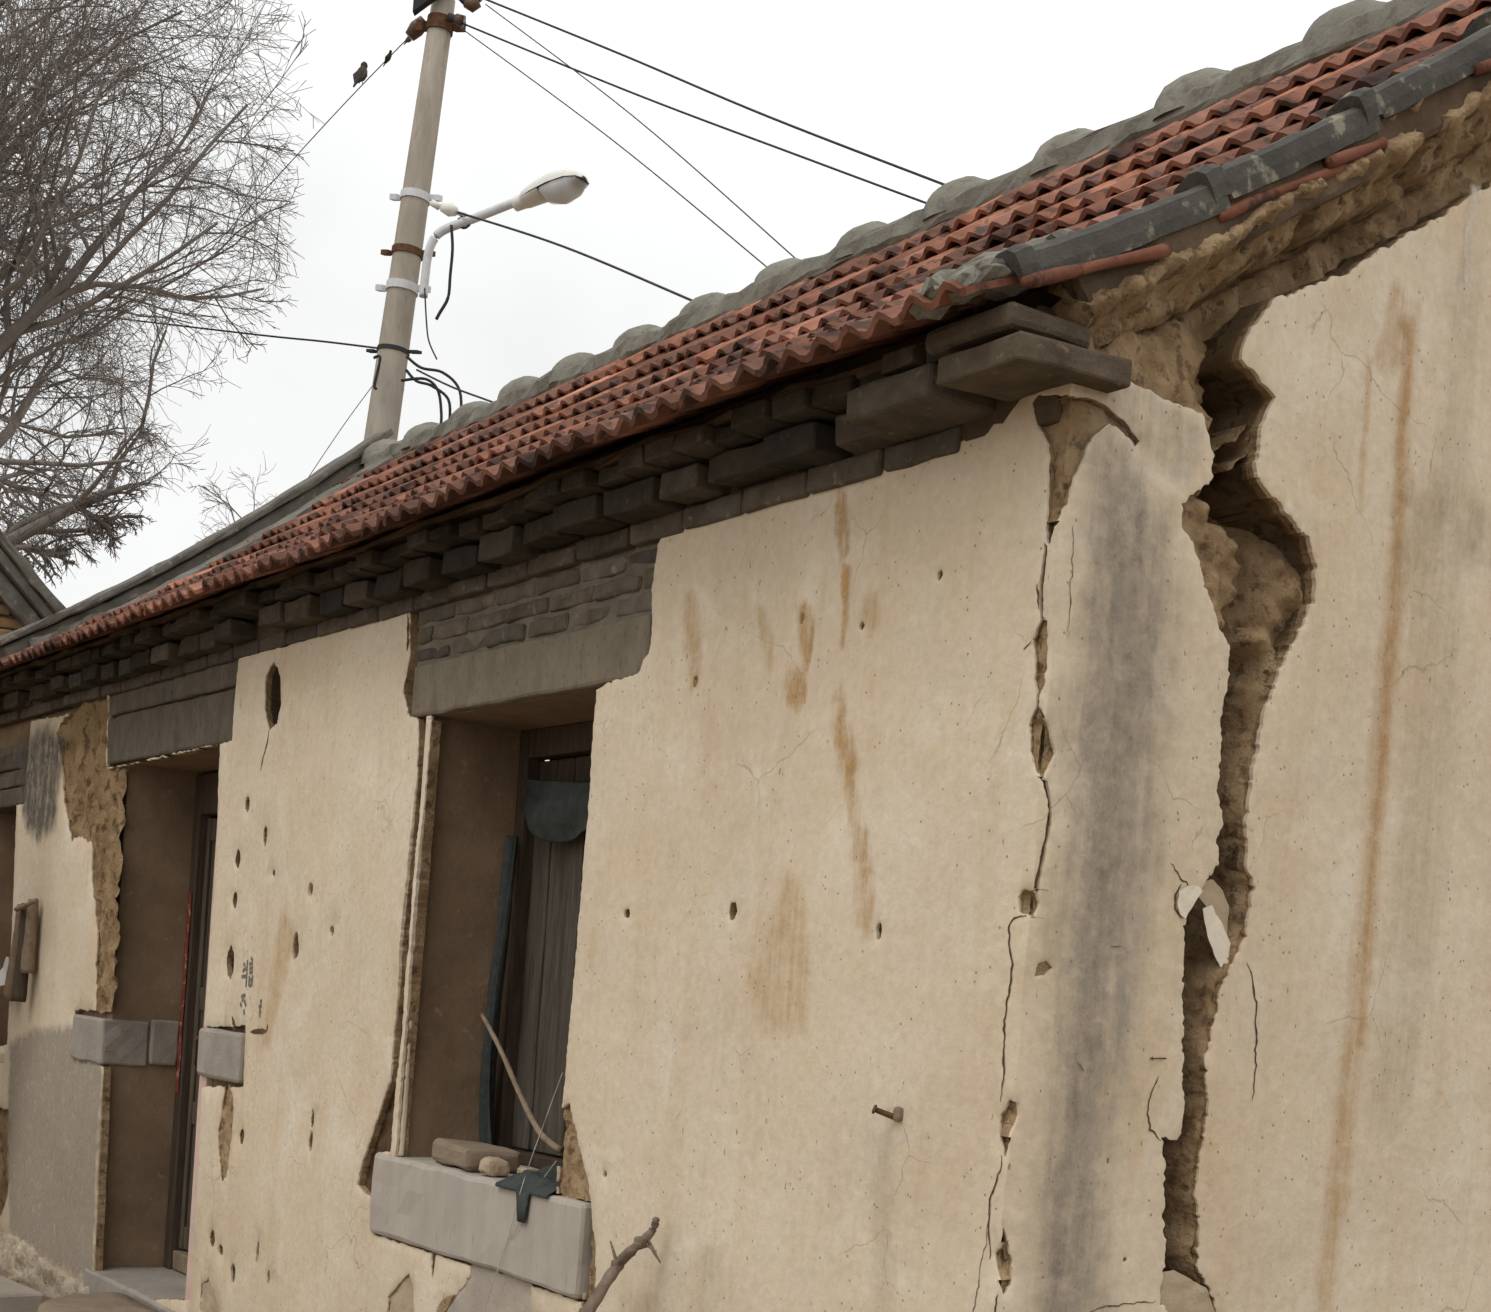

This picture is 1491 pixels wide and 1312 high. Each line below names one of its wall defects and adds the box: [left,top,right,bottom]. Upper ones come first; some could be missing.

spalling [1088,141,1491,474]
crack [1024,528,1074,649]
spalling [56,698,128,1014]
crack [1000,781,1047,1102]
water stain [1050,461,1161,1312]
crack [1090,425,1306,1312]
peeling [0,1108,89,1299]
spalling [389,1275,414,1312]
peeling [436,1264,536,1312]
crack [973,1155,1002,1312]